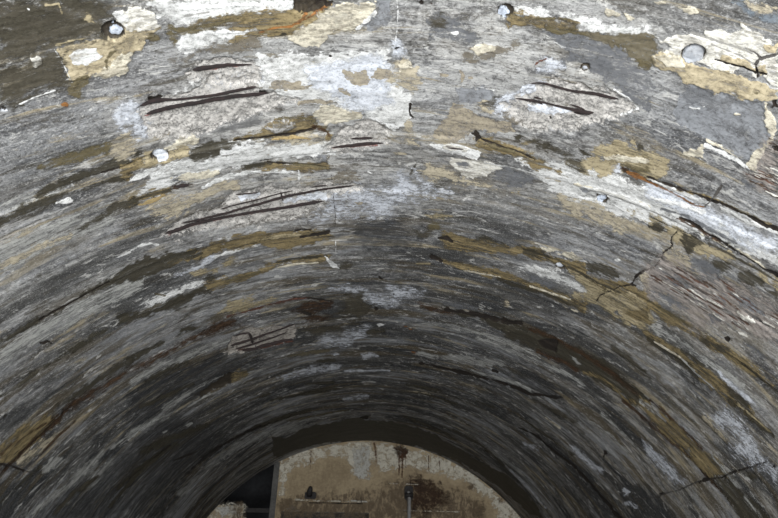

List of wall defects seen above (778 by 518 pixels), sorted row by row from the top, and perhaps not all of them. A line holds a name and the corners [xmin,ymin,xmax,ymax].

peeling [54,0,778,267]
crack [714,48,778,108]
crack [596,176,778,301]
rust [0,297,334,475]
crack [634,462,775,500]